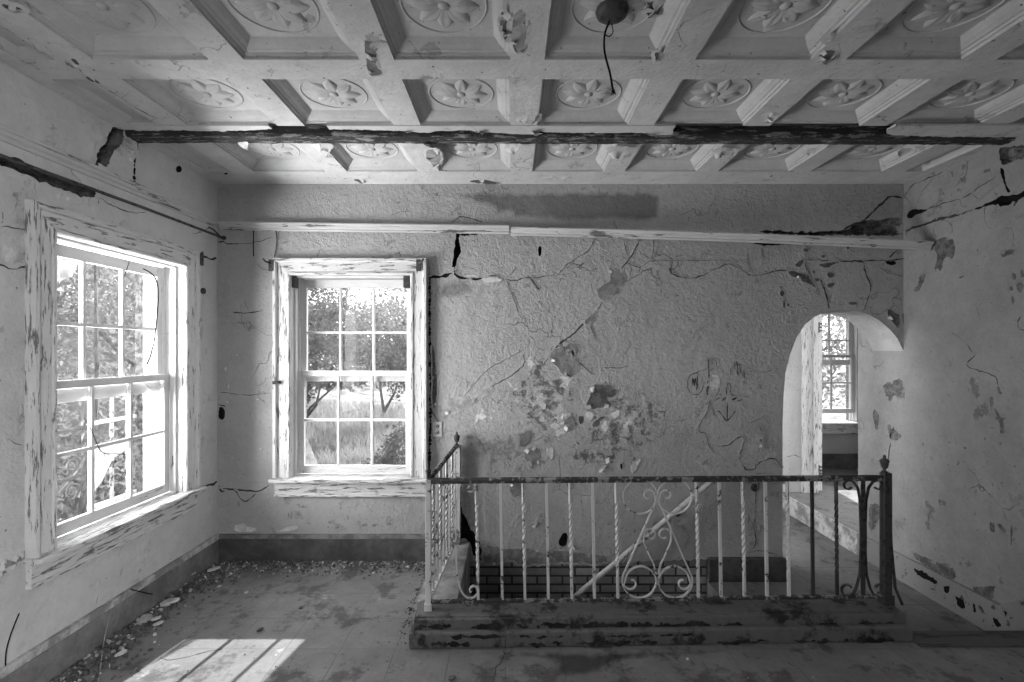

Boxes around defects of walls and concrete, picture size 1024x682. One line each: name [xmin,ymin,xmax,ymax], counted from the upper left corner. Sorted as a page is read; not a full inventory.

peeling [361,38,386,77]
peeling [497,5,532,55]
spalling [95,127,142,171]
crack [113,122,1024,311]
crack [428,214,595,469]
crack [463,300,628,396]
crack [951,330,1006,395]
peeling [430,341,666,499]
peeling [872,376,907,443]
crack [203,479,269,502]
crack [696,400,801,556]
peeling [912,550,1010,630]